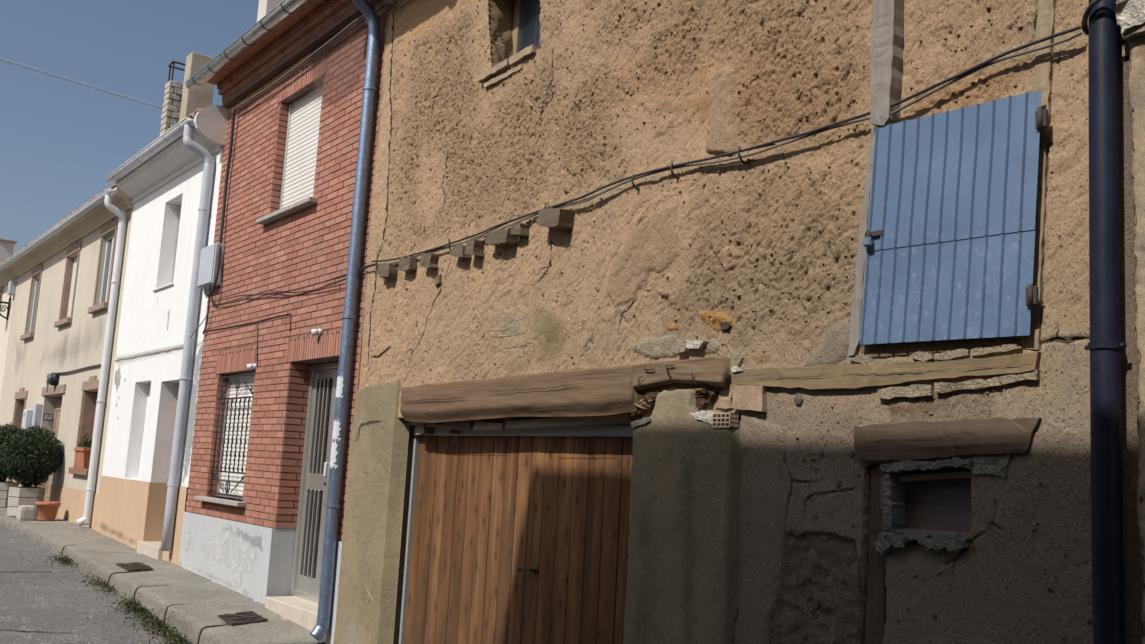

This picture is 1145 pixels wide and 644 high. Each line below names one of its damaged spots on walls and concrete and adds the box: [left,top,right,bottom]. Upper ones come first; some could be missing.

crack [368,8,452,359]
peeling [628,310,734,359]
spalling [631,417,652,428]
spalling [691,410,716,425]
crack [782,439,852,531]